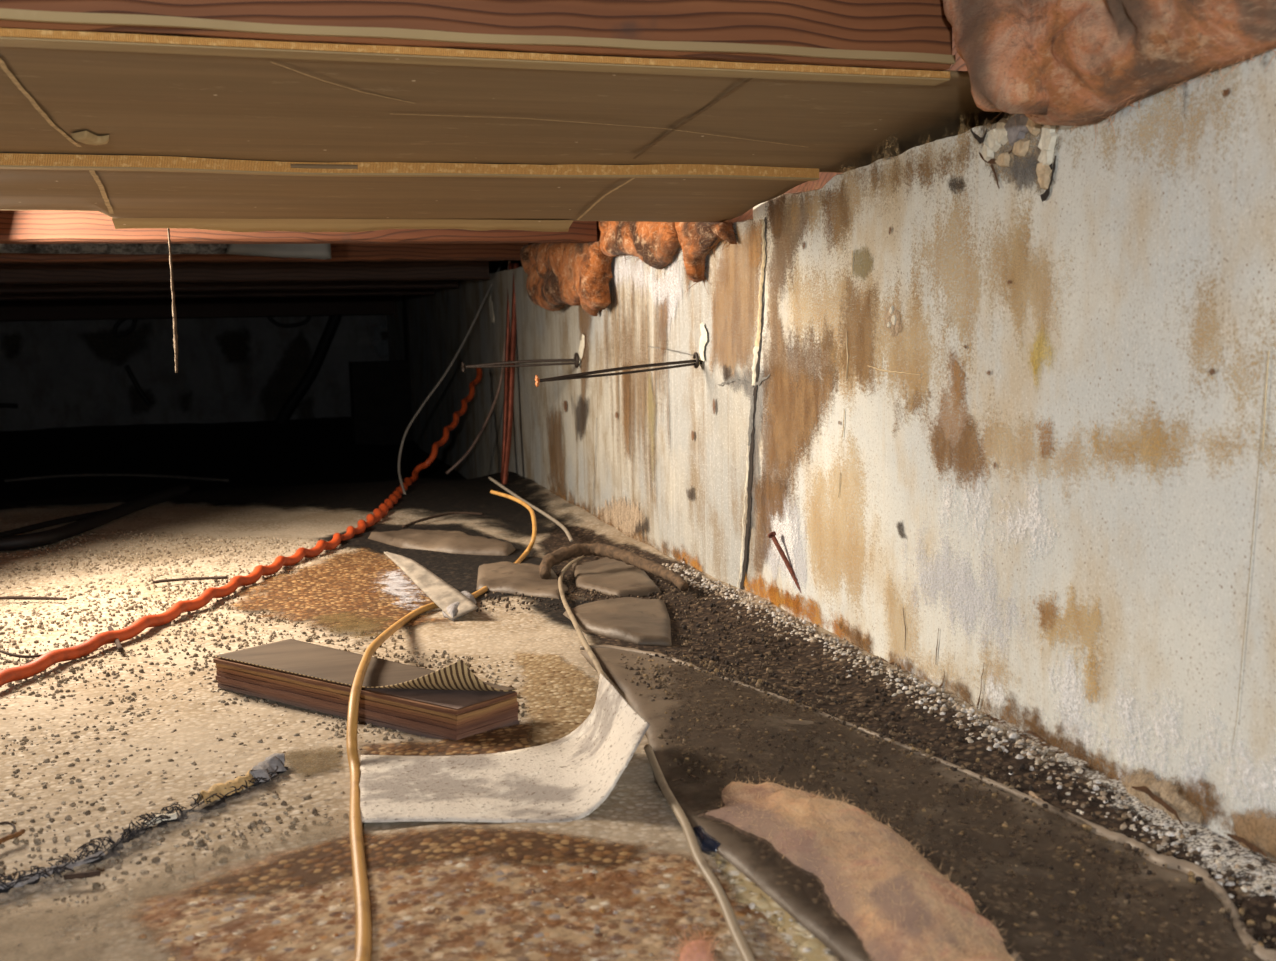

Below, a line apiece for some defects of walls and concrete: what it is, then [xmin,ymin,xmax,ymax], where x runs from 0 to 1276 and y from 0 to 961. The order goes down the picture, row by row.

leakage [546,255,690,559]
crack [718,217,770,590]
leakage [699,119,1057,601]
spalling [970,114,1060,202]
leakage [885,280,1276,894]
crack [1229,351,1270,765]